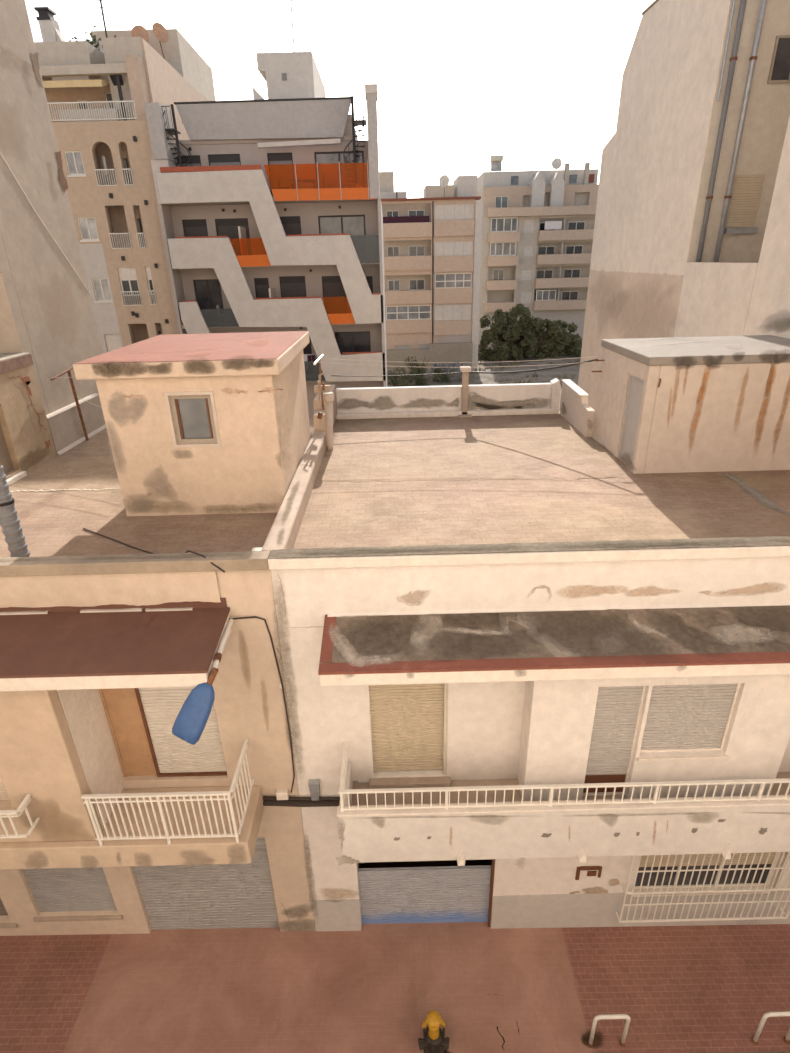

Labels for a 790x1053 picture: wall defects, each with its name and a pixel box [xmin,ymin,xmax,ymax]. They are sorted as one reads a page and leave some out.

damp [93,362,170,377]
damp [185,360,212,373]
damp [225,358,272,369]
rust [691,371,709,433]
rust [756,367,775,441]
crack [8,376,51,448]
peeling [403,592,423,603]
peeling [570,586,616,597]
peeling [630,588,668,596]
peeling [723,583,777,594]
damp [334,633,381,665]